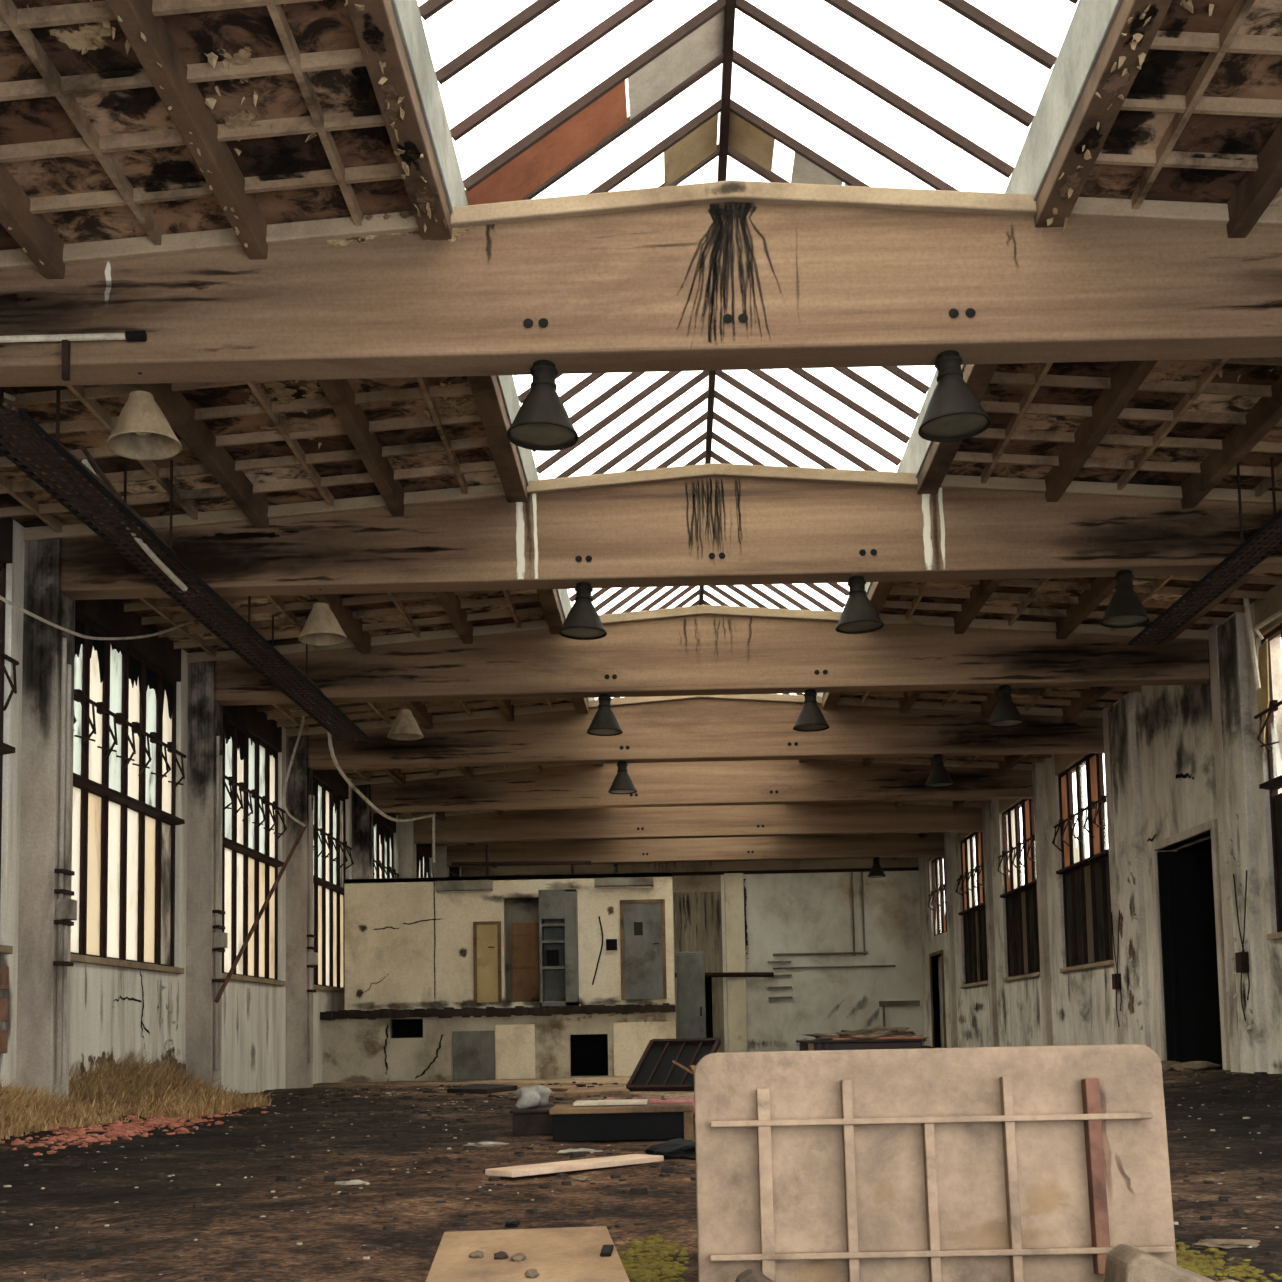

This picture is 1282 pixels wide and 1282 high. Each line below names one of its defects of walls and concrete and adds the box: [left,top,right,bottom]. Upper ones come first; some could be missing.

peeling [1096,4,1159,109]
peeling [1180,0,1214,16]
peeling [325,0,473,246]
peeling [1047,122,1102,231]